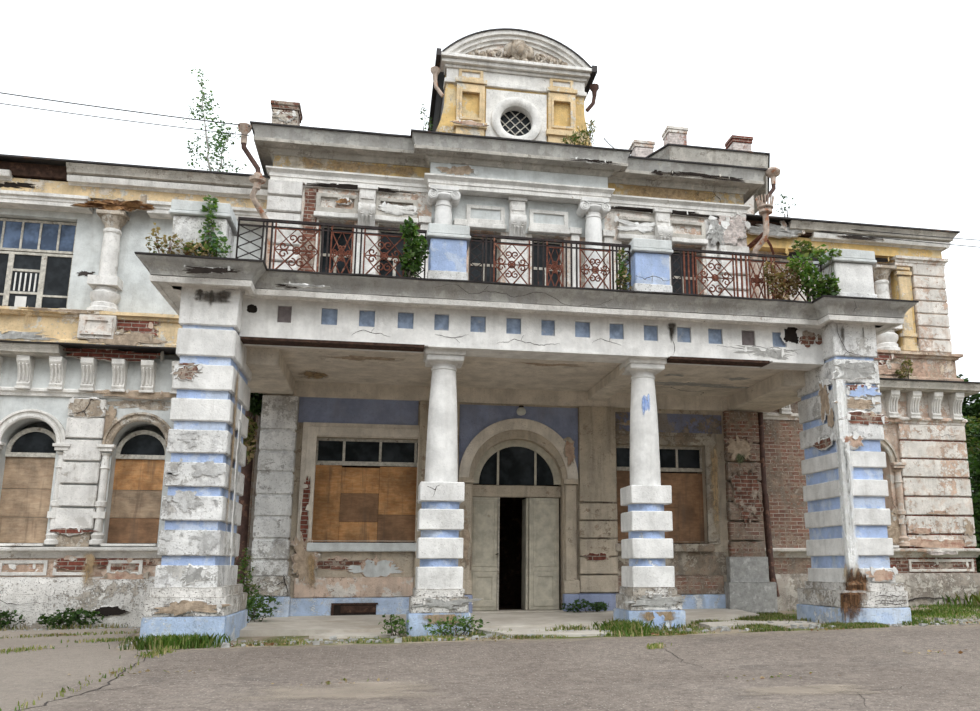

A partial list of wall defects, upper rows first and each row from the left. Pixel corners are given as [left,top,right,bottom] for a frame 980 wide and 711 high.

spalling [71,195,155,213]
flaking render [87,320,168,361]
peeling [733,328,822,360]
spalling [170,363,203,382]
flaking render [67,389,177,437]
spalling [813,353,909,451]
peeling [165,404,242,568]
spalling [290,475,404,588]
flaking render [53,555,156,579]
peeling [161,529,218,586]
peeling [152,598,232,617]
rust [840,563,868,623]